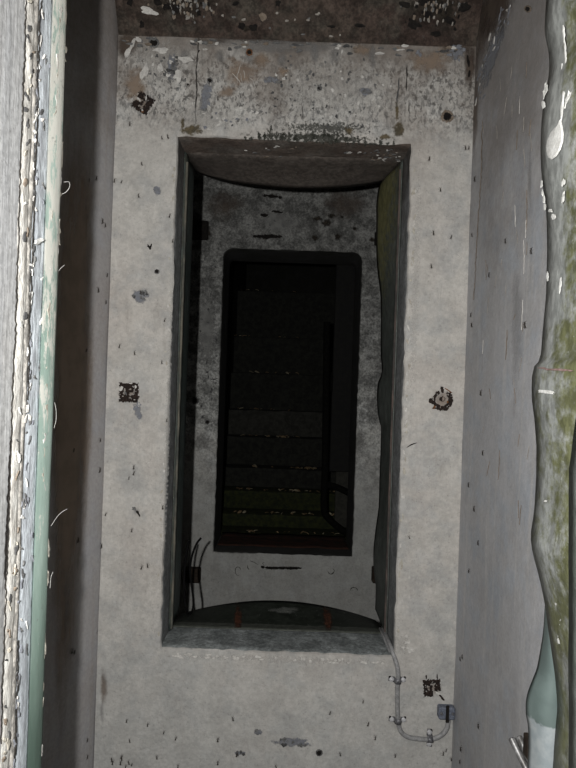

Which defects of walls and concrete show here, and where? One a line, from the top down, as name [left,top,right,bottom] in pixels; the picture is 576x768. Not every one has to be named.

spalling [124,0,320,96]
spalling [399,0,471,37]
flaking render [200,49,351,130]
peeling [311,74,392,133]
peeling [546,90,571,159]
peeling [0,0,67,768]
rust [429,387,453,411]